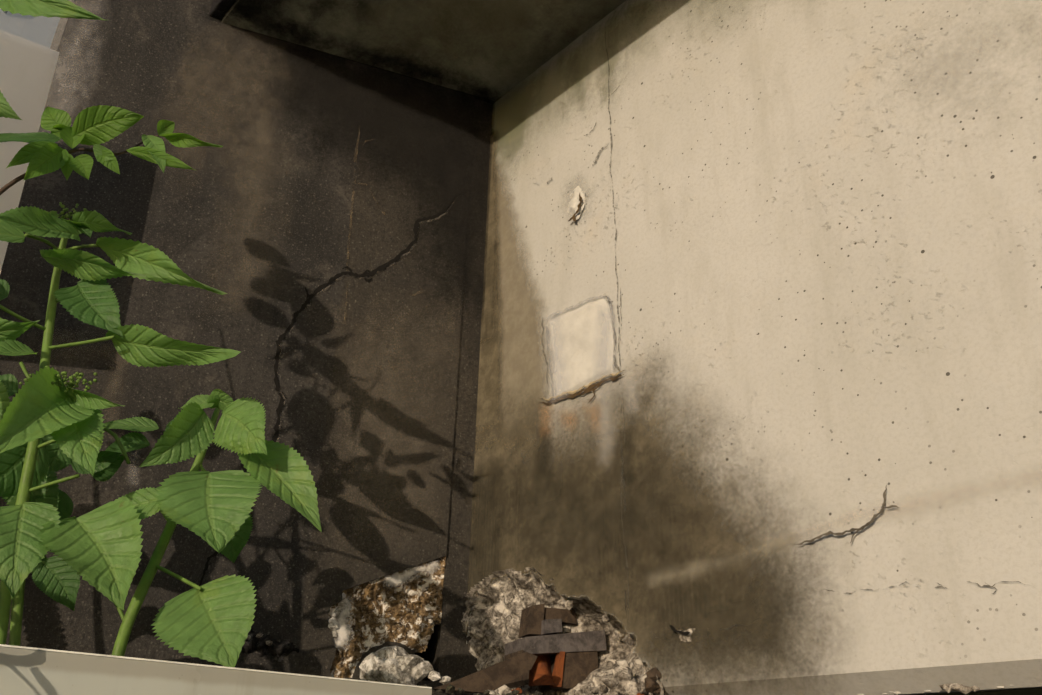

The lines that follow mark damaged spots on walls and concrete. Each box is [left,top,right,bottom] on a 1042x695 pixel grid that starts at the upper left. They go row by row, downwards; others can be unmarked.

crack [540,26,625,405]
crack [272,182,463,442]
leakage [467,133,805,686]
crack [199,551,219,586]
spalling [328,556,446,678]
corrosion [550,651,565,688]
spalling [461,566,664,695]
crack [793,485,900,545]